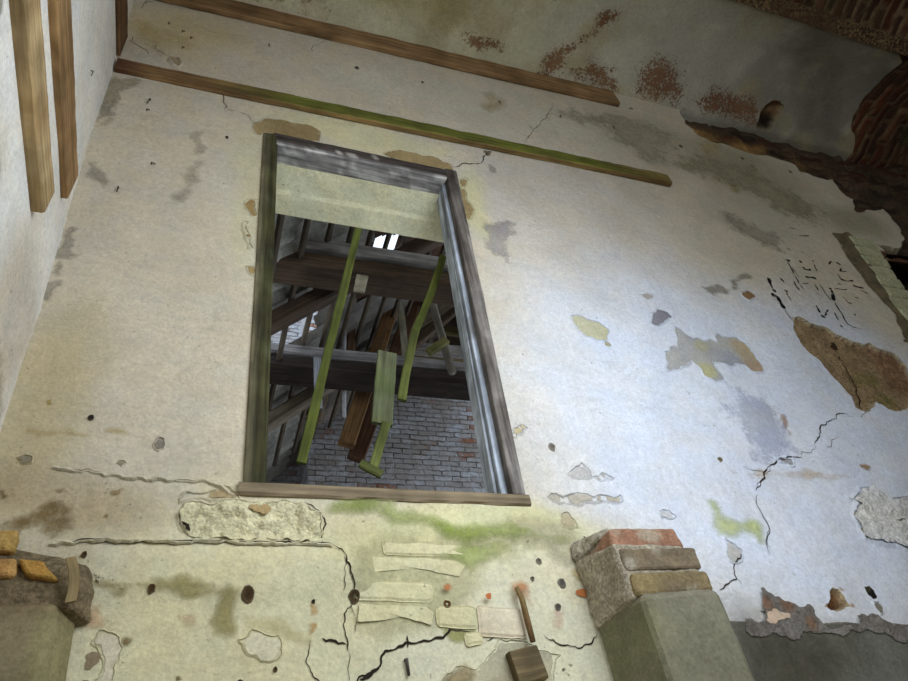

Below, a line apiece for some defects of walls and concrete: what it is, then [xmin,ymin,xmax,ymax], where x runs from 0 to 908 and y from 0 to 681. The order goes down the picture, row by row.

spalling [679,54,908,267]
peeling [638,292,765,383]
spalling [792,316,908,412]
crack [53,466,234,496]
crack [748,412,866,555]
spalling [176,484,325,545]
water stain [515,523,576,560]
crack [49,502,495,681]
crack [543,634,597,649]
water stain [574,570,587,597]
crack [719,556,742,590]
spalling [745,587,908,643]